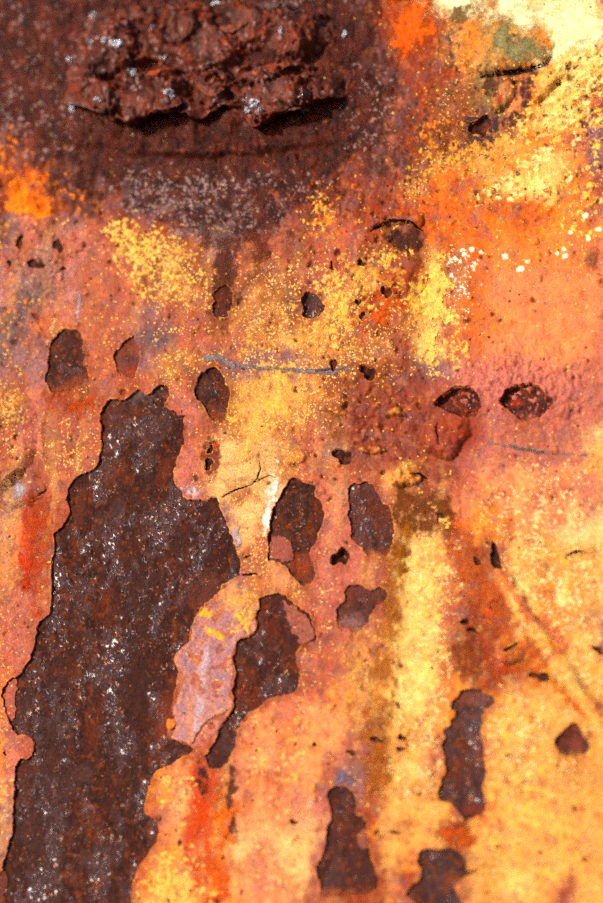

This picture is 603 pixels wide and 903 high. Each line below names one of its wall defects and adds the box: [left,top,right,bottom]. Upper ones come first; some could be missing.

rust [0,0,437,305]
rust [473,66,538,127]
rust [372,223,429,327]
rust [200,436,221,476]
peeling [264,450,398,590]
peeling [0,325,321,903]
peeling [333,581,391,633]
rust [361,481,582,801]
peeling [434,685,498,824]
rust [183,762,240,903]
peeling [313,783,382,902]
peeling [403,844,479,903]